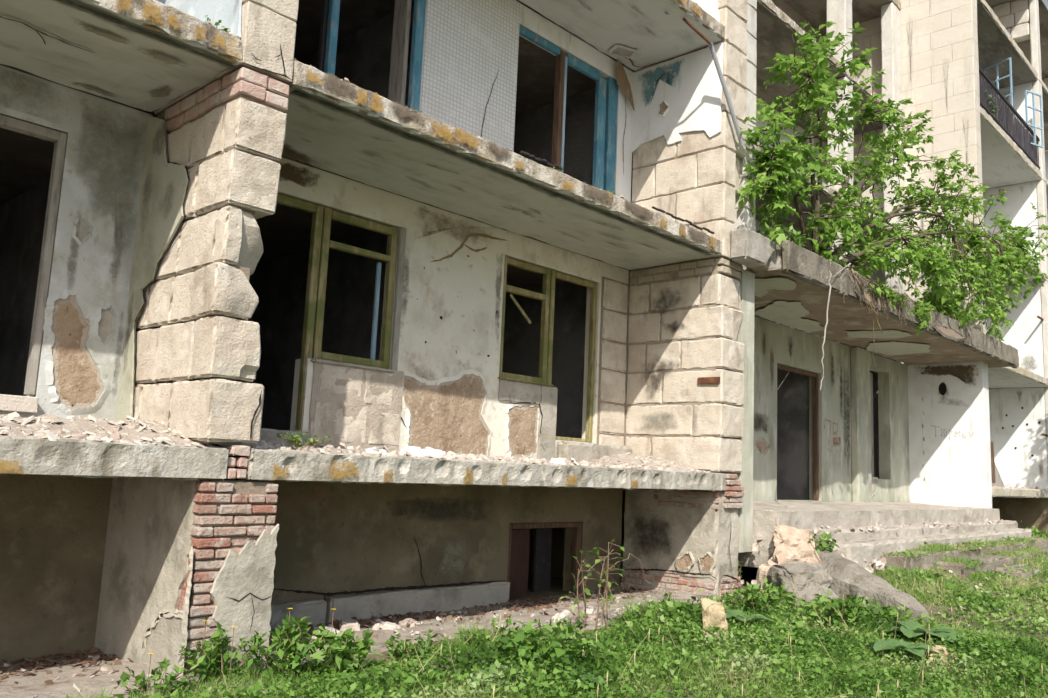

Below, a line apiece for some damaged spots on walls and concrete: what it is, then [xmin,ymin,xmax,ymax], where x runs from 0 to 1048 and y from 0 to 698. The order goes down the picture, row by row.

peeling [631,42,723,153]
crack [132,134,189,410]
crack [431,233,507,262]
peeling [754,278,824,333]
spalling [855,287,891,312]
peeling [844,330,931,355]
spalling [933,322,966,342]
spalling [402,369,540,459]
flaking render [139,482,279,676]